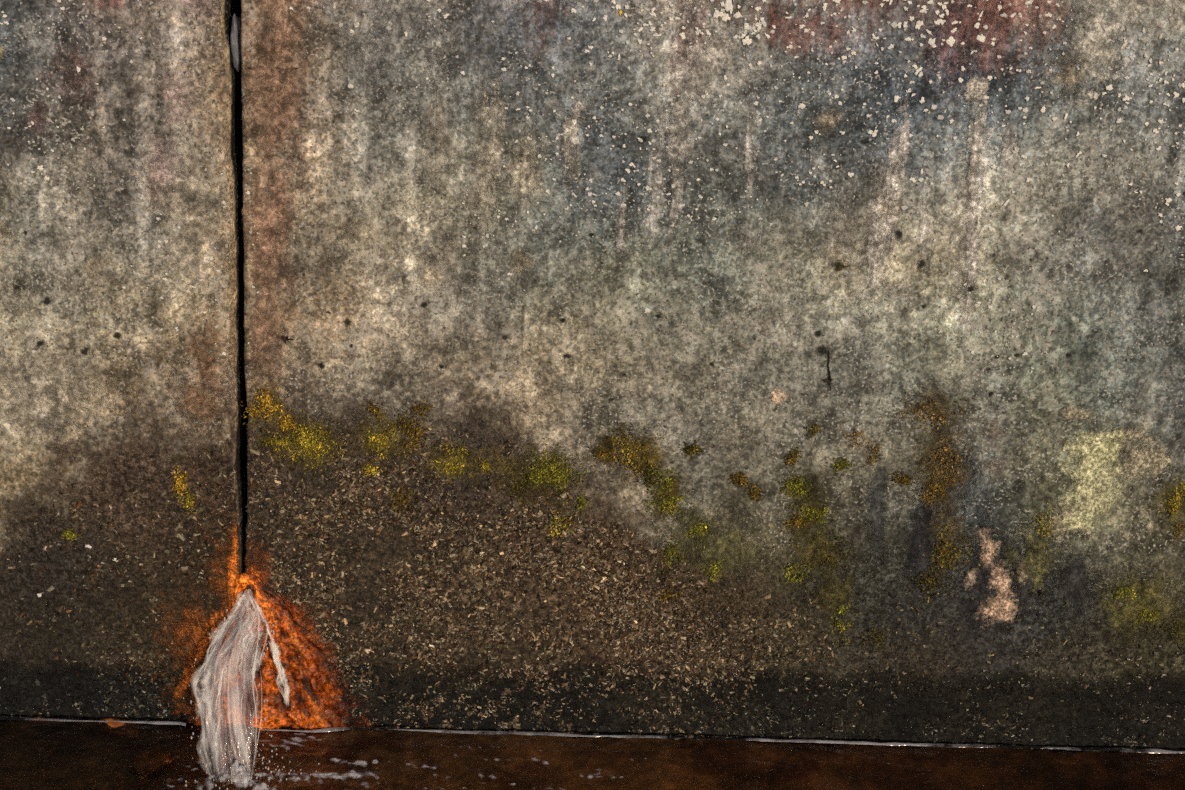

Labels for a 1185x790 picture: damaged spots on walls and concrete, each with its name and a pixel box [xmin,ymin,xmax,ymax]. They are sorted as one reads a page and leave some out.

water stain [759,0,891,57]
water stain [927,0,1185,90]
water stain [144,135,224,282]
water stain [422,100,544,228]
water stain [564,105,579,177]
water stain [616,198,625,254]
water stain [645,11,733,232]
water stain [745,118,757,187]
water stain [826,103,909,292]
water stain [949,97,1017,334]
water stain [0,354,1185,693]
corrosion [157,513,369,735]